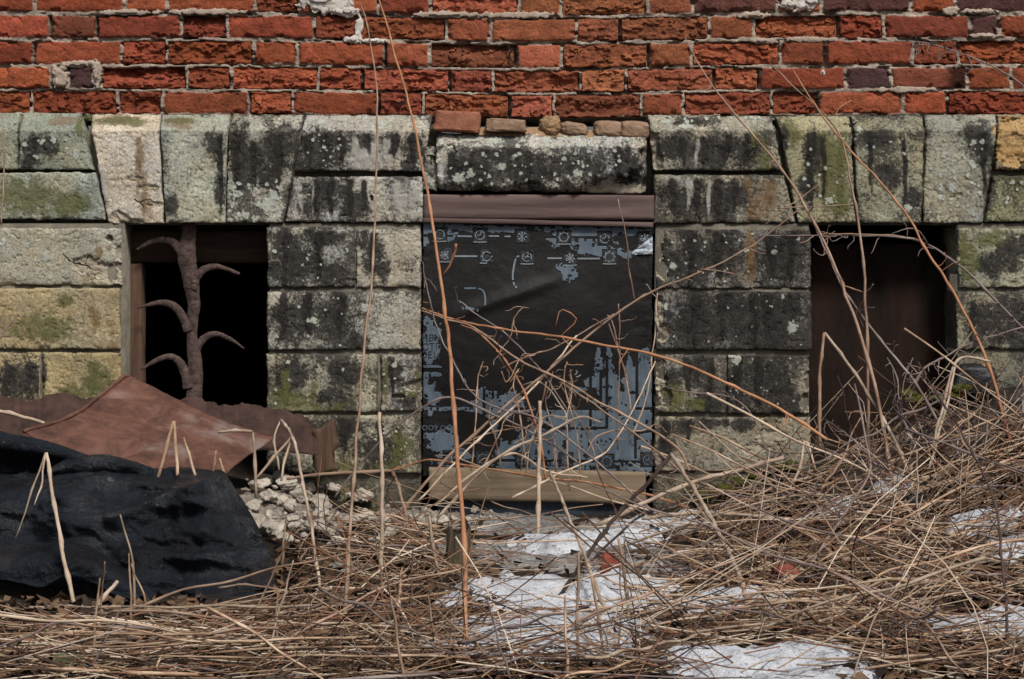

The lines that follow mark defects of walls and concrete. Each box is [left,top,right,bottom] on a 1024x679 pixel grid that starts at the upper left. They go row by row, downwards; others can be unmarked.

spalling [0,0,881,118]
water stain [20,132,59,168]
water stain [165,192,179,217]
water stain [444,143,645,190]
water stain [795,120,846,210]
water stain [860,128,922,212]
water stain [963,119,994,194]
water stain [203,114,427,470]
water stain [654,115,810,463]